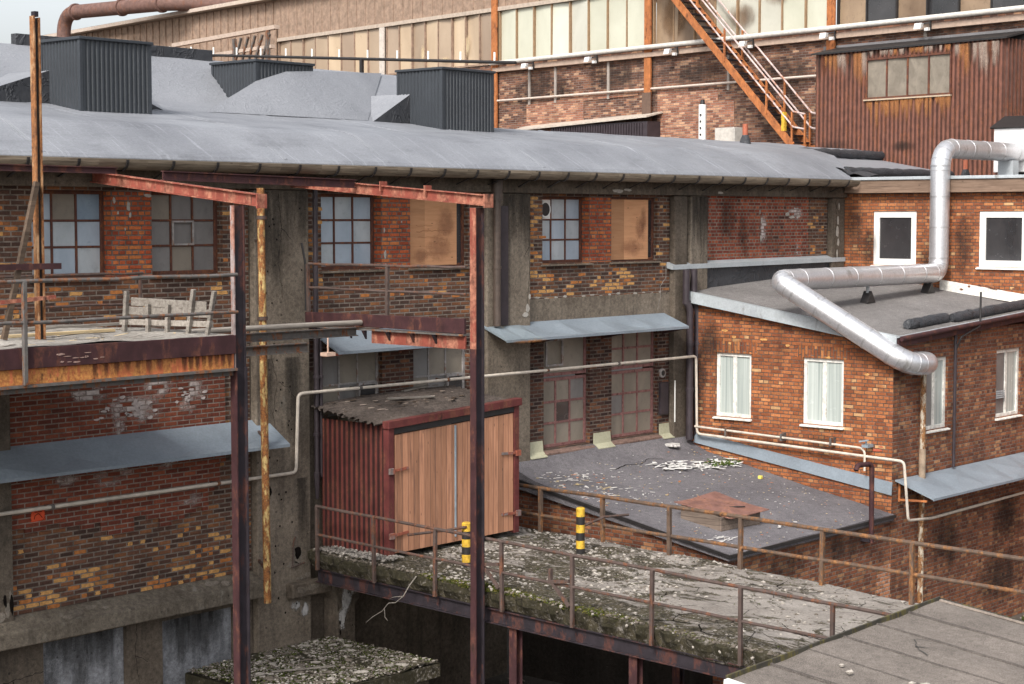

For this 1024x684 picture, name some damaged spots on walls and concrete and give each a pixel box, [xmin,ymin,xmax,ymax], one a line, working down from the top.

rust [818,41,997,72]
rust [867,96,950,118]
rust [93,359,164,374]
rust [182,354,232,369]
peeling [94,387,157,421]